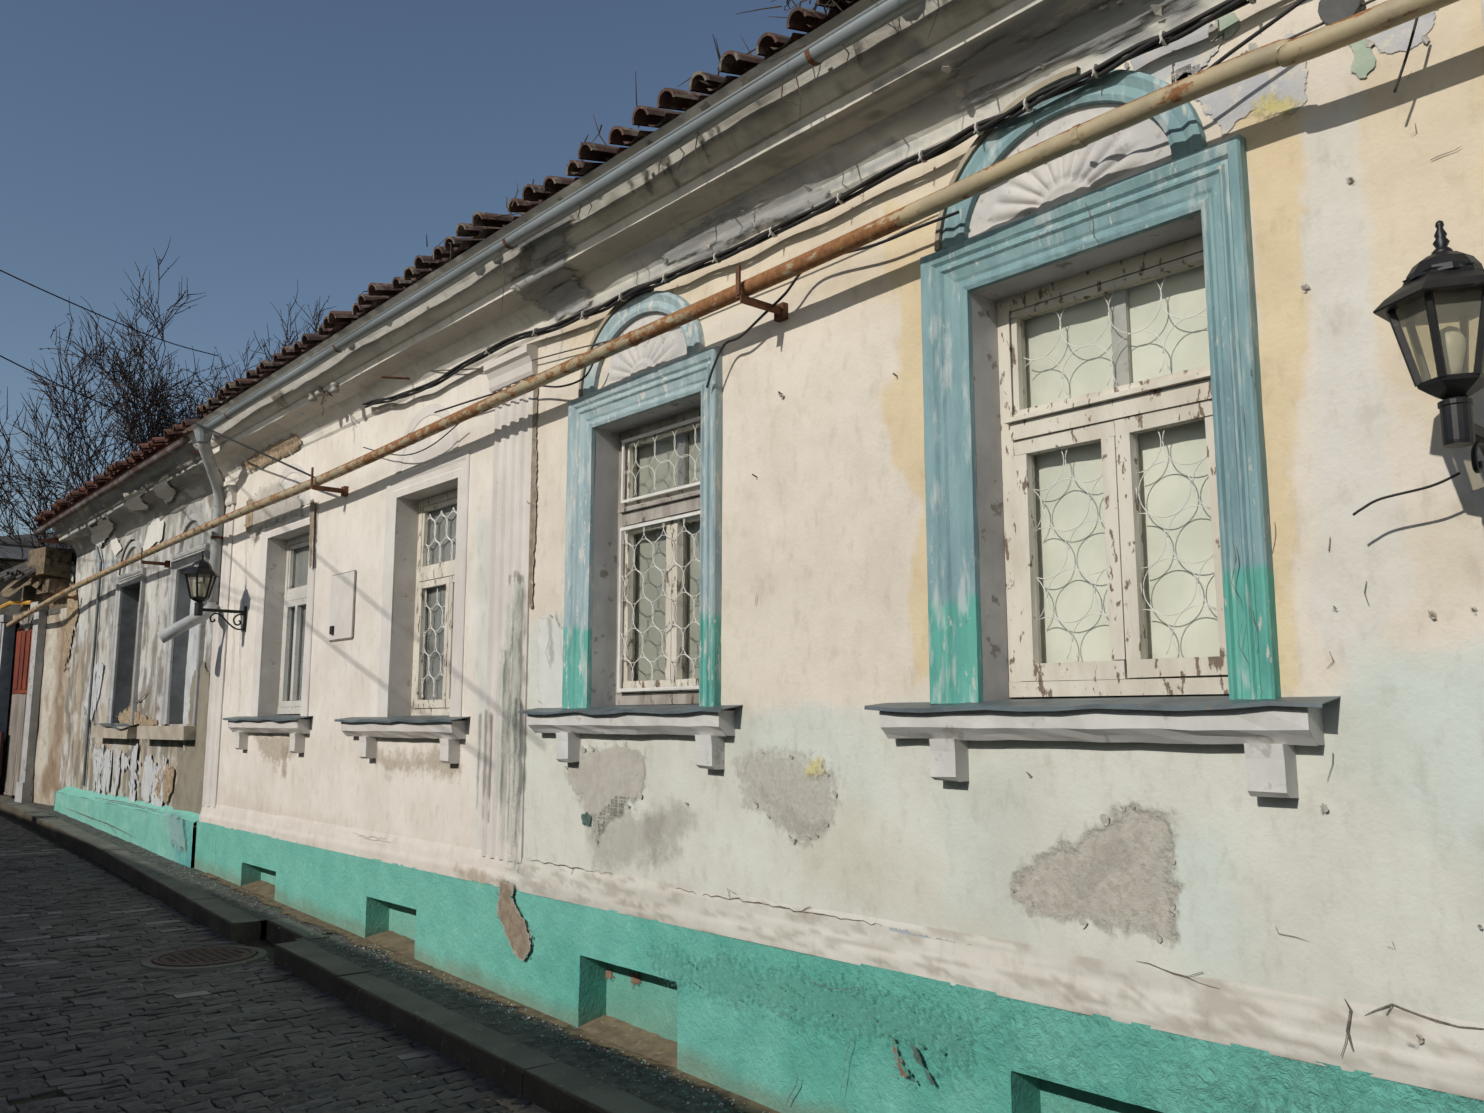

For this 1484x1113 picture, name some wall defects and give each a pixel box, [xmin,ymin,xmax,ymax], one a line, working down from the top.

peeling [1350,11,1436,78]
peeling [1195,62,1308,138]
flaking render [62,576,79,673]
peeling [84,662,103,722]
flaking render [118,706,158,726]
peeling [1010,803,1180,944]
peeling [92,743,745,1113]
flaking render [888,1033,943,1085]
crack [1341,999,1484,1056]